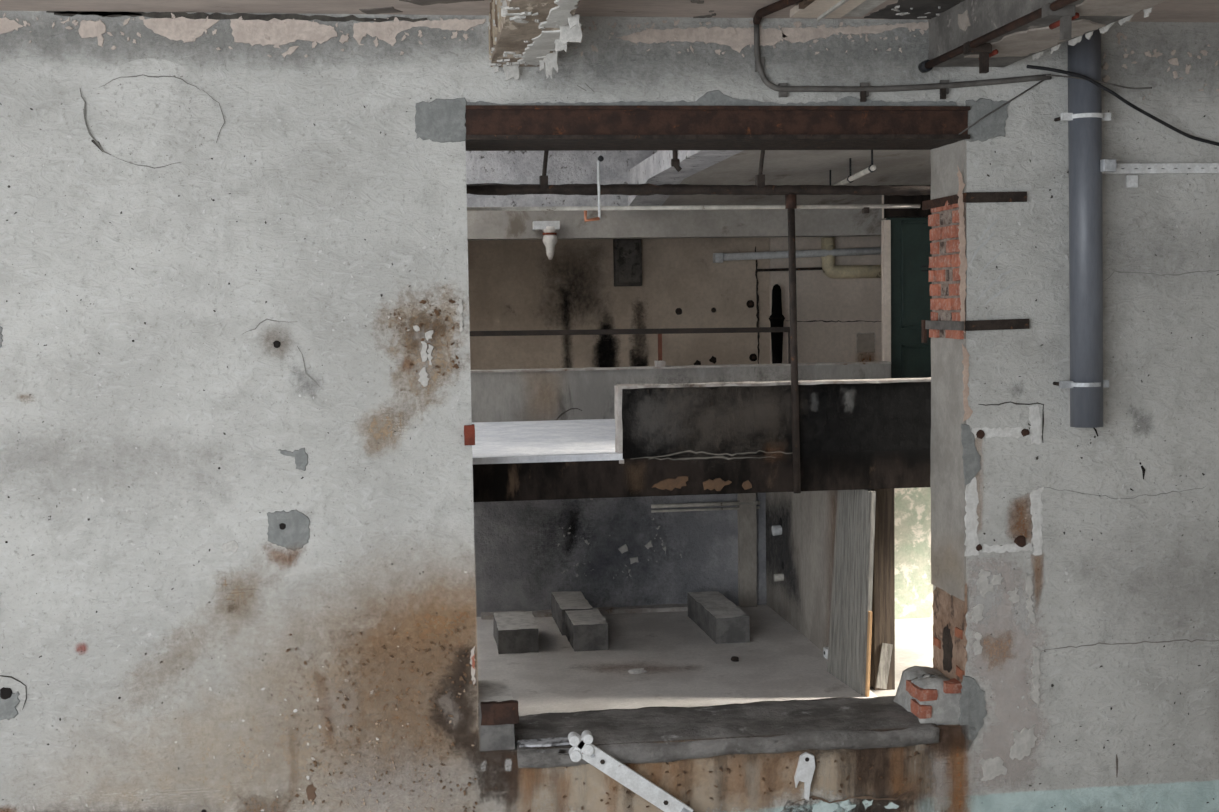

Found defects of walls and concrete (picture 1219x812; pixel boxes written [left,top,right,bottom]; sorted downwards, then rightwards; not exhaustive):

peeling [0,17,23,34]
peeling [61,17,106,47]
peeling [143,17,337,57]
peeling [353,0,583,81]
peeling [616,0,971,53]
peeling [964,0,1164,60]
crack [80,74,225,169]
corrosion [380,287,464,404]
corrosion [273,552,297,564]
corrosion [202,594,664,812]
corrosion [595,725,966,812]
peeling [781,791,909,812]